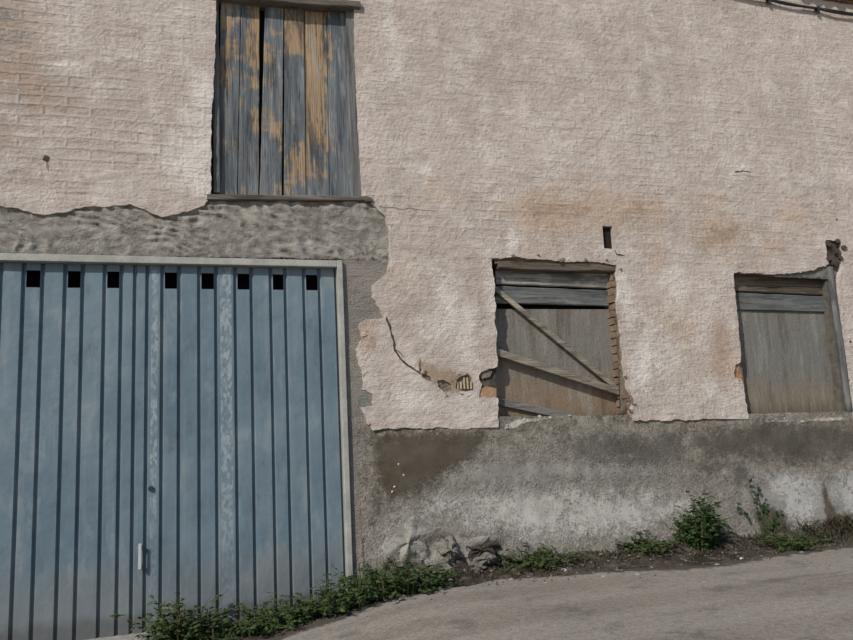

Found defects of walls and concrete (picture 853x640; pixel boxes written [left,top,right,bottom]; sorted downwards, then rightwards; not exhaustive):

crack [386,317,437,383]
flaking render [422,367,497,397]
flaking render [360,389,373,407]
flaking render [505,415,552,429]
damp [374,431,715,564]